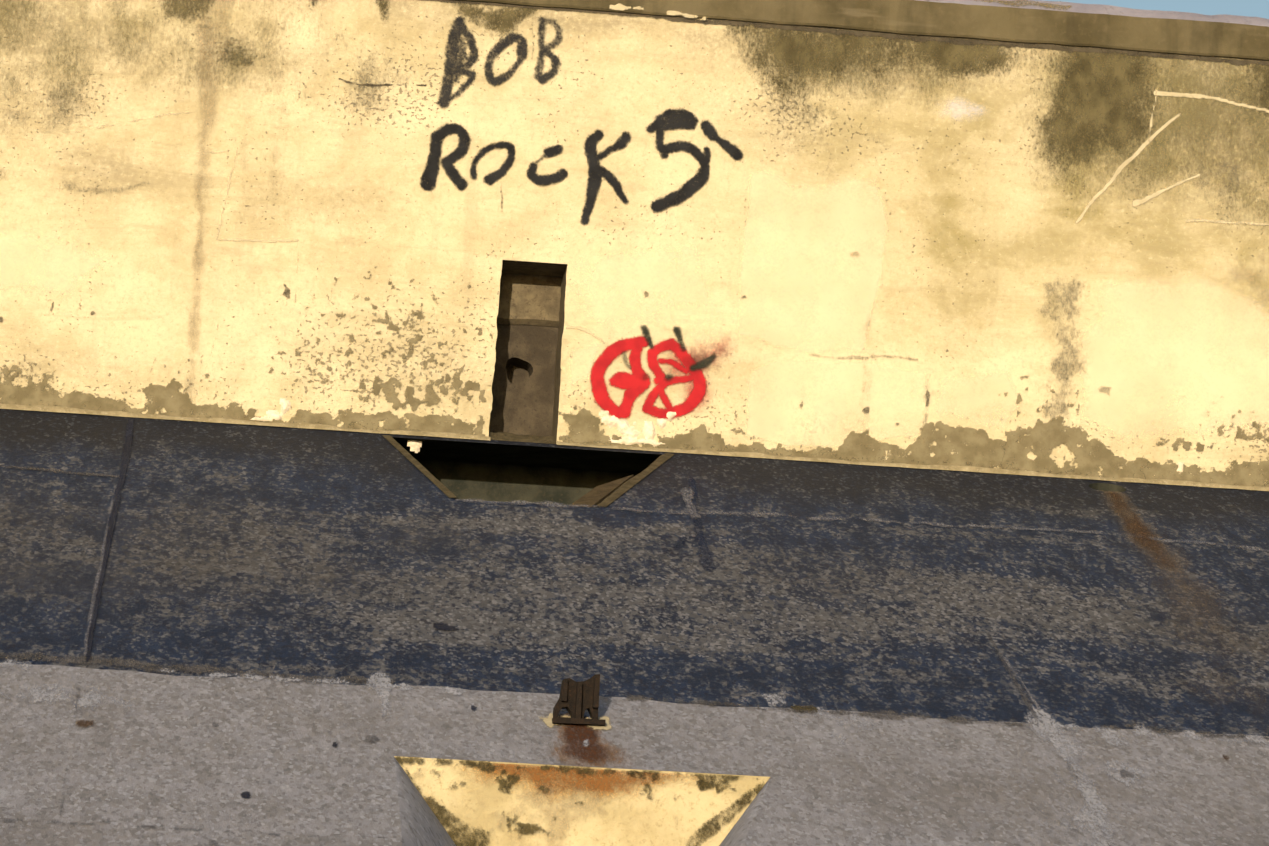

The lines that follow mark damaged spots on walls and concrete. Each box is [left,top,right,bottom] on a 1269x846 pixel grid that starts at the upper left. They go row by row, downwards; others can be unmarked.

leakage [1042,46,1269,181]
corrosion [473,712,679,800]